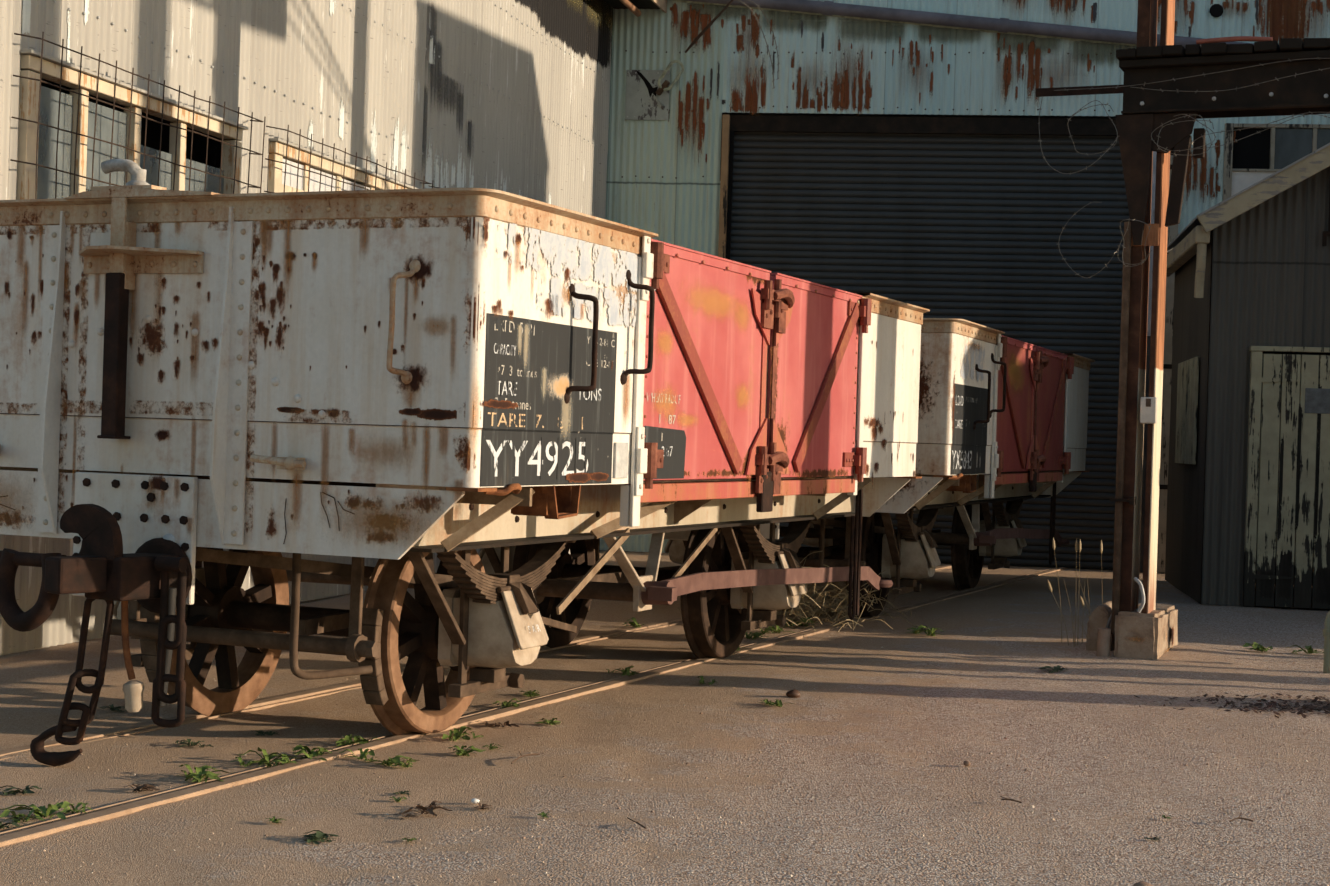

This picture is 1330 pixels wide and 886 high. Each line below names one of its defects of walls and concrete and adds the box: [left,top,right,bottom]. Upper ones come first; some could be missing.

corrosion [670,3,774,114]
corrosion [791,39,873,115]
corrosion [892,34,950,105]
corrosion [1050,0,1093,23]
corrosion [1174,0,1195,33]
corrosion [1211,0,1330,46]
corrosion [668,72,709,162]
corrosion [1186,131,1236,202]
peeling [1277,404,1321,599]